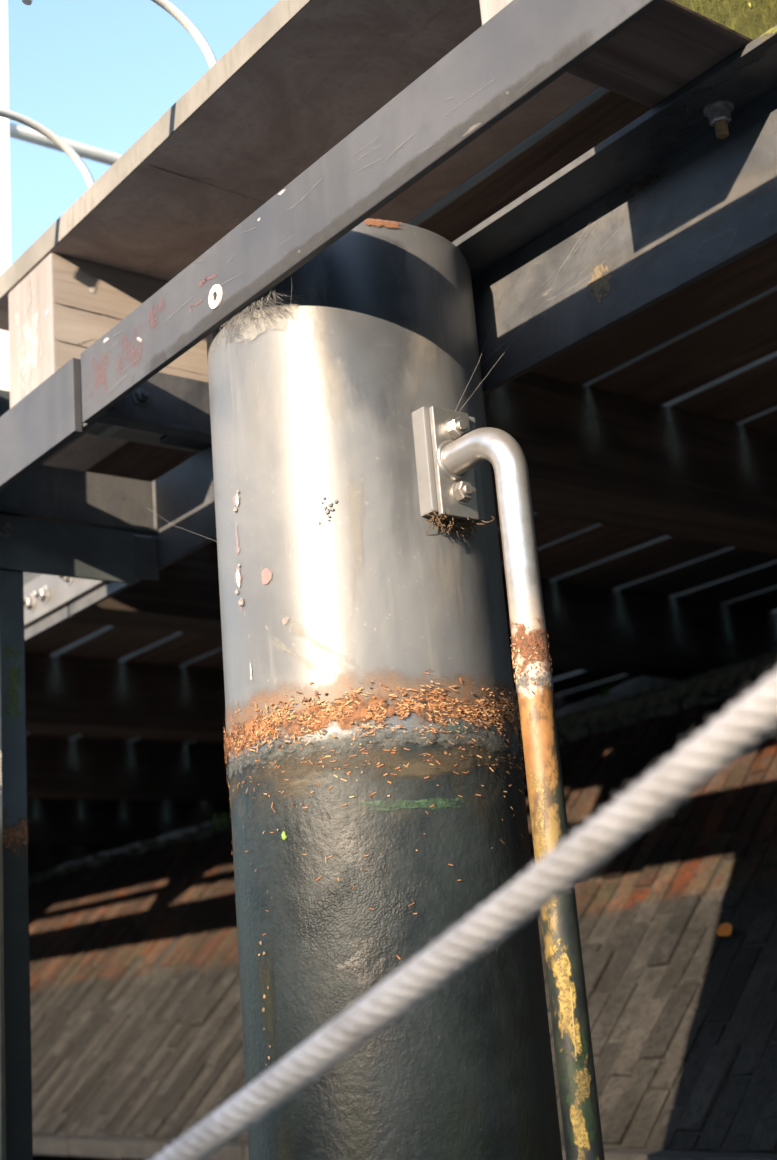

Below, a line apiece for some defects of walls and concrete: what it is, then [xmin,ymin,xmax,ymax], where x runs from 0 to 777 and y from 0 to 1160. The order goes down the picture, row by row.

corrosion [3,814,31,855]
corrosion [223,618,555,821]
peeling [530,770,547,862]
peeling [550,938,602,1160]